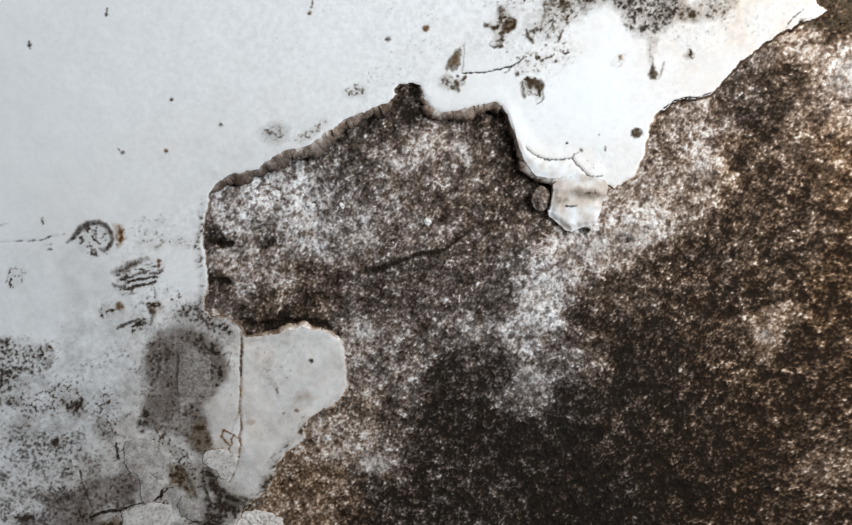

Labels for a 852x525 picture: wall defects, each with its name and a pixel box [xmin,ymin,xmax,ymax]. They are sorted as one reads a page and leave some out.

damp [484,6,517,48]
damp [526,0,731,43]
damp [516,54,557,100]
damp [114,259,163,333]
spalling [202,0,852,525]
damp [0,338,53,406]
damp [137,302,233,455]
crack [210,322,243,482]
damp [0,426,138,525]
crack [80,470,174,518]
crack [191,483,213,524]
damp [169,444,289,525]